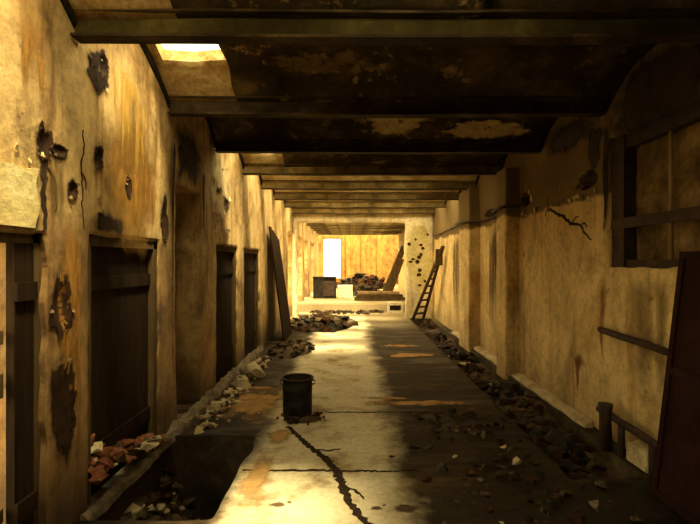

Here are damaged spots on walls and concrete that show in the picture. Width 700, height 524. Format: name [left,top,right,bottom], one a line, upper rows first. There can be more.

spalling [87,49,110,96]
peeling [0,124,69,228]
spalling [67,179,80,201]
crack [79,130,87,230]
spalling [94,142,104,170]
peeling [366,118,431,140]
peeling [436,120,530,139]
crack [545,197,591,240]
peeling [406,225,432,292]
spalling [48,272,76,340]
spalling [51,357,77,464]
crack [270,426,414,524]